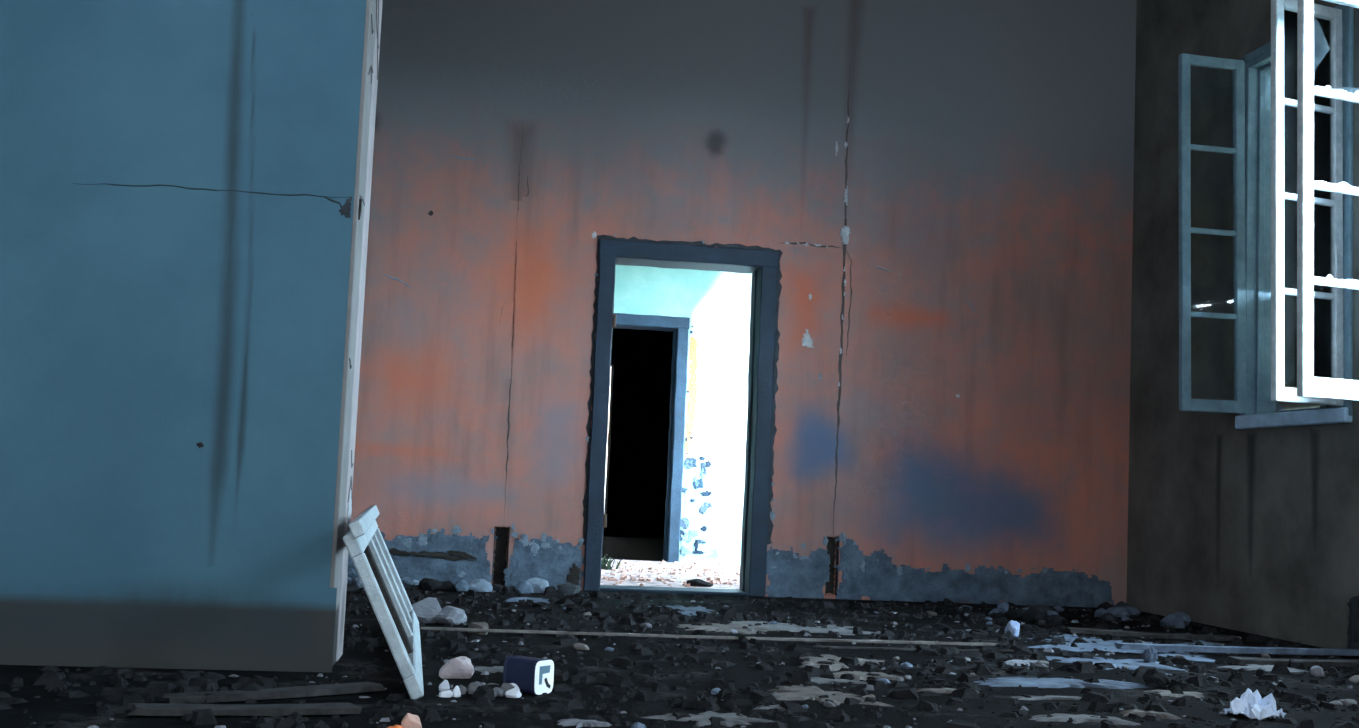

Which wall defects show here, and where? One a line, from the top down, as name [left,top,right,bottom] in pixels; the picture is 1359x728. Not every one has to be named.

crack [368,0,379,84]
corrosion [354,197,599,466]
corrosion [775,258,834,410]
crack [780,70,852,535]
flaking render [347,553,359,581]